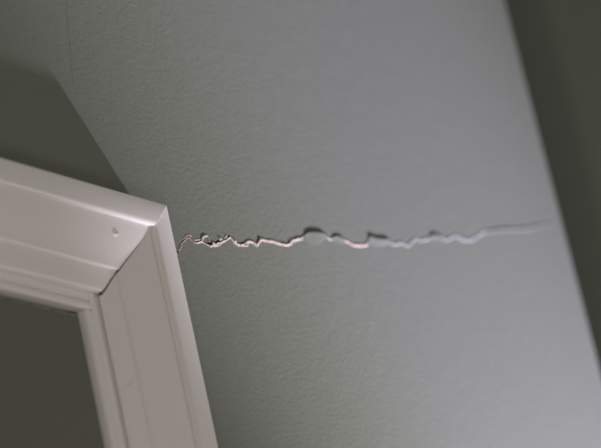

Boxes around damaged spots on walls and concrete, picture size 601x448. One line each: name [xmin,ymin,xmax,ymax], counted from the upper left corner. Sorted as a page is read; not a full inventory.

crack [177,223,552,252]